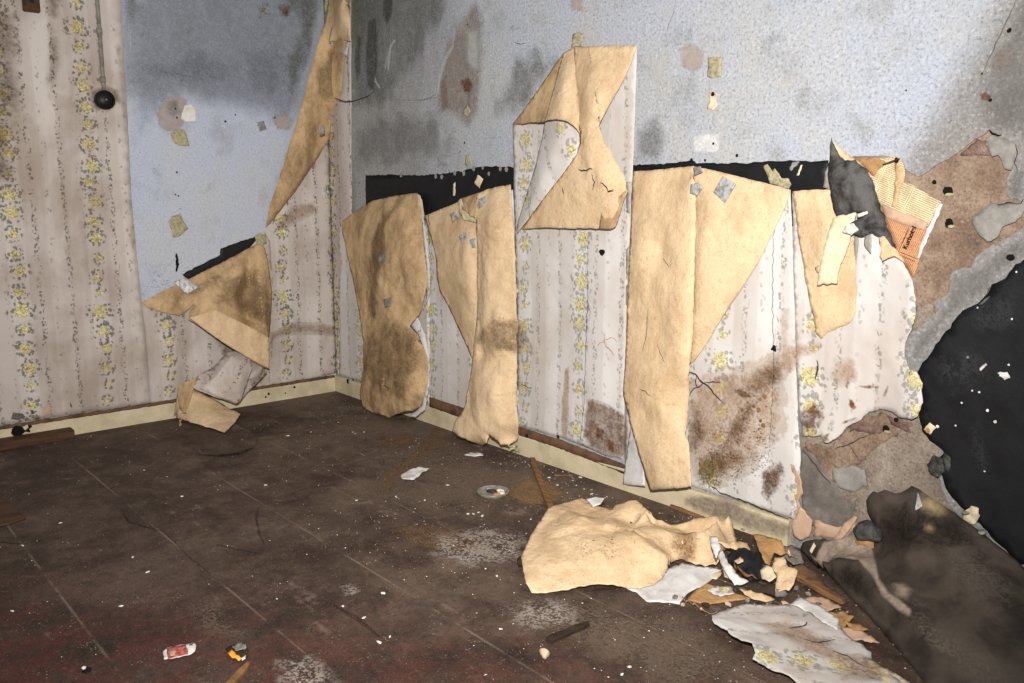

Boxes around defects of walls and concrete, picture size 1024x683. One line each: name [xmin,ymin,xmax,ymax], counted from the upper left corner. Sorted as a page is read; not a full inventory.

flaking render [904,131,1024,332]
damp [585,401,626,455]
damp [692,347,806,490]
flaking render [800,409,960,540]